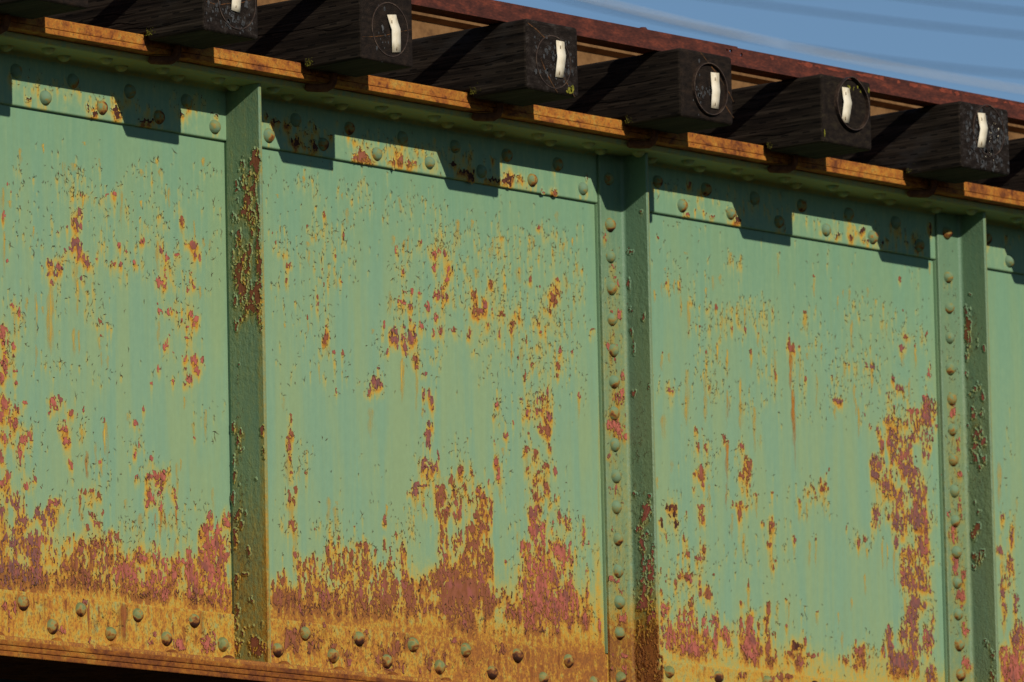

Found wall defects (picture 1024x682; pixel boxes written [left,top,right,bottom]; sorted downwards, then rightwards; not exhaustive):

peeling [230,146,276,333]
peeling [157,302,199,339]
peeling [358,367,383,397]
corrosion [401,351,419,390]
corrosion [786,338,800,421]
peeling [0,323,252,632]
peeling [270,372,601,674]
peeling [839,364,956,682]
corrosion [107,605,138,639]
corrosion [634,615,666,682]